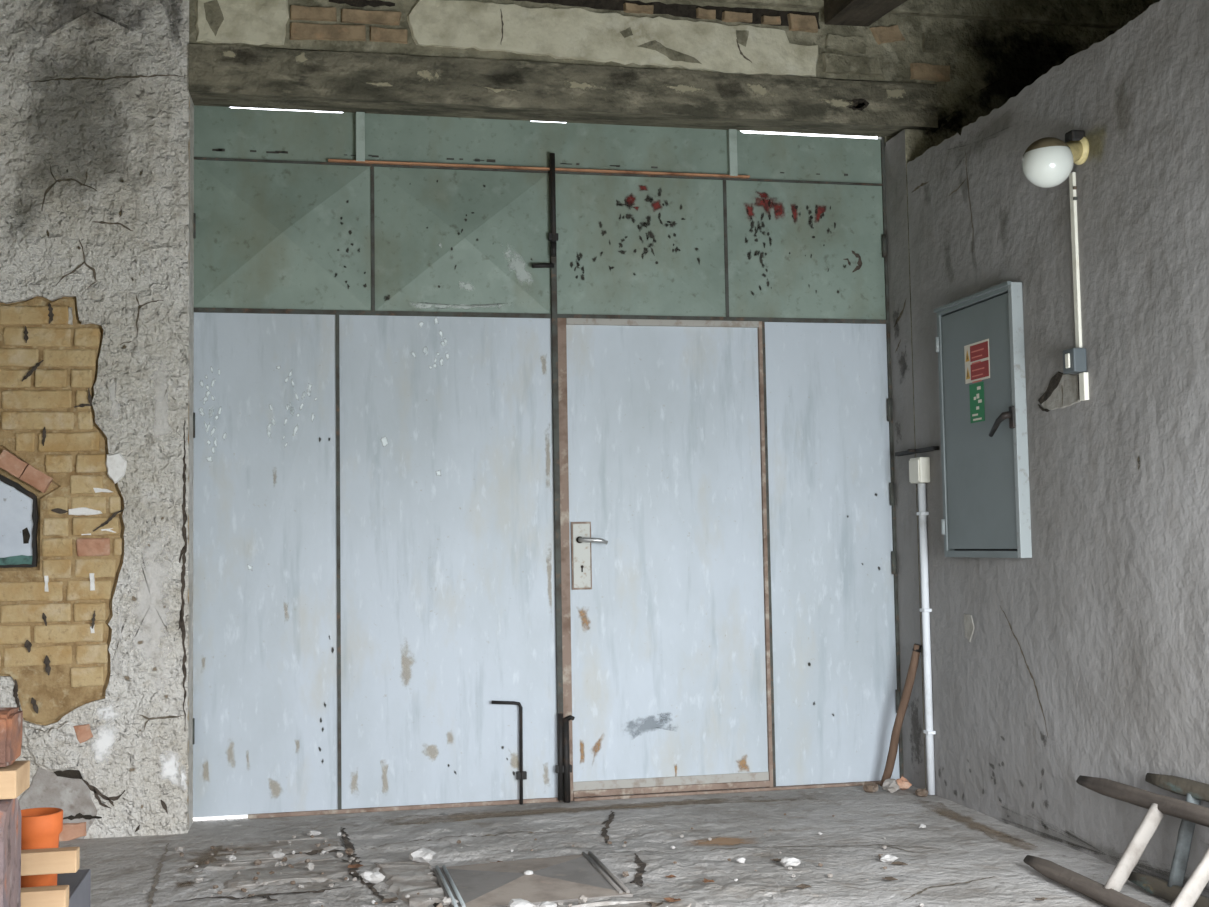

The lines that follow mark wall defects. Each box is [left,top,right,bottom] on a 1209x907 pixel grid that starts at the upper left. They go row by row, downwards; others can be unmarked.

peeling [196,0,960,109]
damp [974,26,1074,109]
damp [923,109,966,136]
peeling [570,185,700,280]
peeling [745,192,836,295]
flaking render [0,298,127,841]
crack [147,811,615,907]
crack [630,846,796,887]
crack [859,844,940,854]